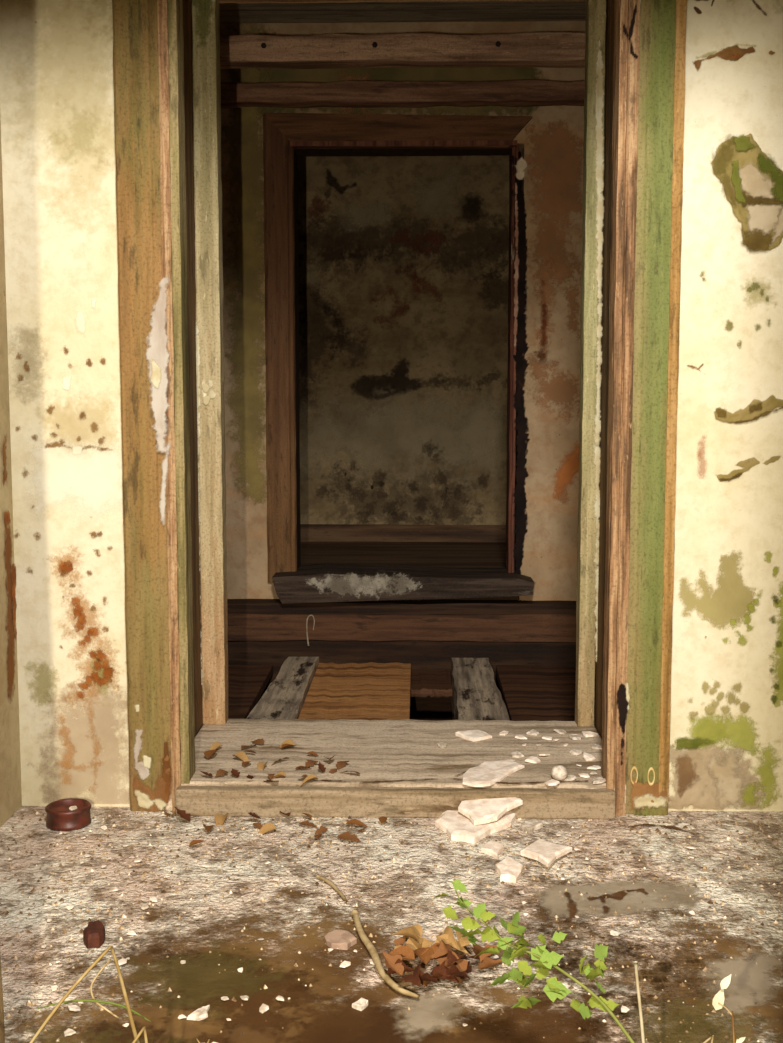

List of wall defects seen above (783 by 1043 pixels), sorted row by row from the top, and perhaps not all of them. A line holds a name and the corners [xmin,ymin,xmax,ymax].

spalling [711,134,783,251]
damp [298,197,509,406]
peeling [146,277,170,524]
spalling [714,395,783,423]
spalling [717,456,780,481]
rust [58,556,114,700]
peeling [134,729,151,780]
spalling [668,746,765,810]